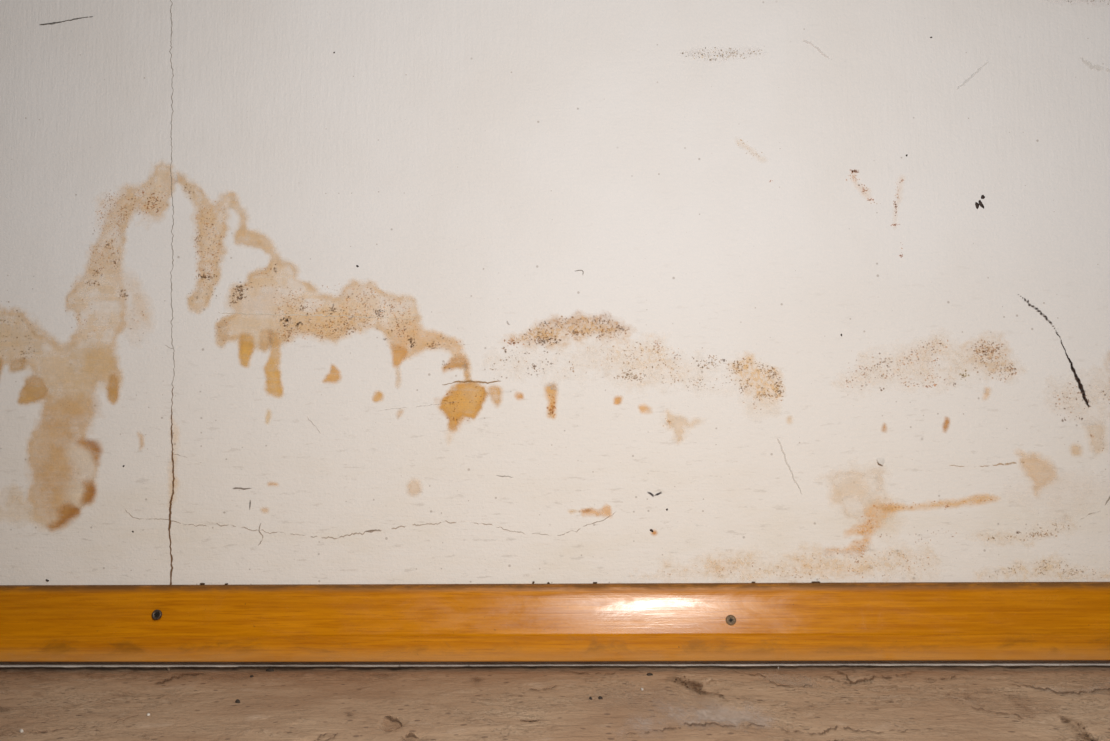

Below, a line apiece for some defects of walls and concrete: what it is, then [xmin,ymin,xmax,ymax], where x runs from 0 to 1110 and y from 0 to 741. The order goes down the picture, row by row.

crack [164,0,277,585]
damp [0,172,500,527]
crack [444,378,498,386]
damp [547,386,556,415]
damp [502,316,710,384]